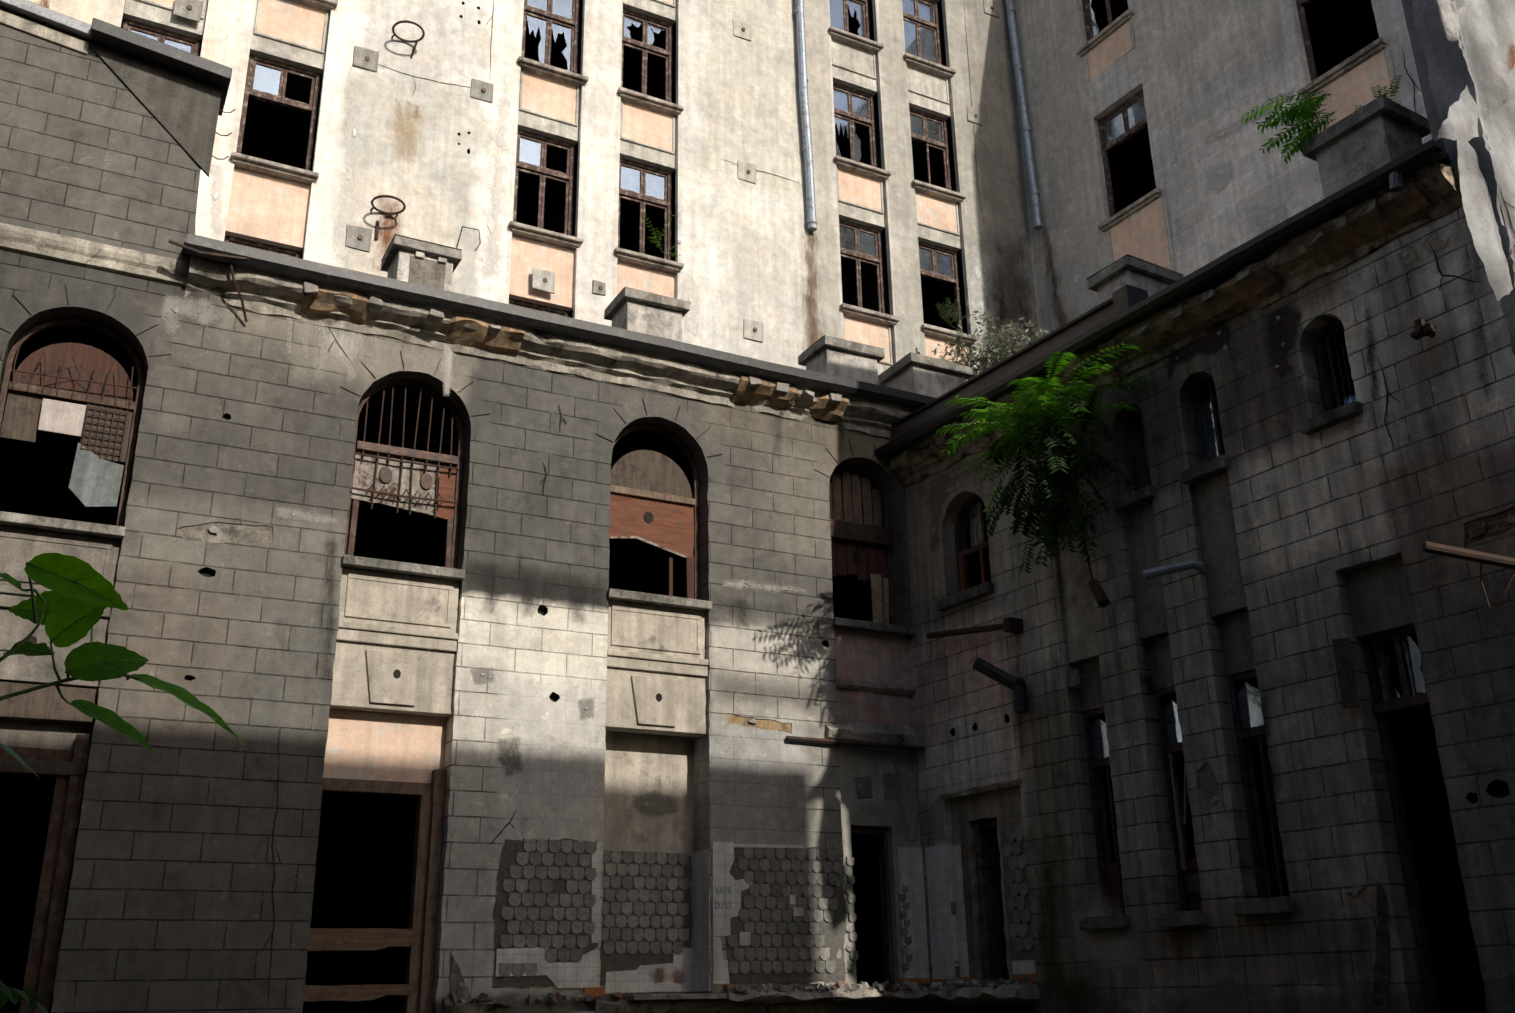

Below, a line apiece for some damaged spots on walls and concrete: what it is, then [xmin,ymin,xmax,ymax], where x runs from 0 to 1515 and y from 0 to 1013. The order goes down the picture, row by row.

crack [1428,191,1515,291]
peeling [161,296,219,333]
spalling [278,281,384,325]
spalling [427,309,525,357]
spalling [1465,507,1515,547]
spalling [727,713,791,734]